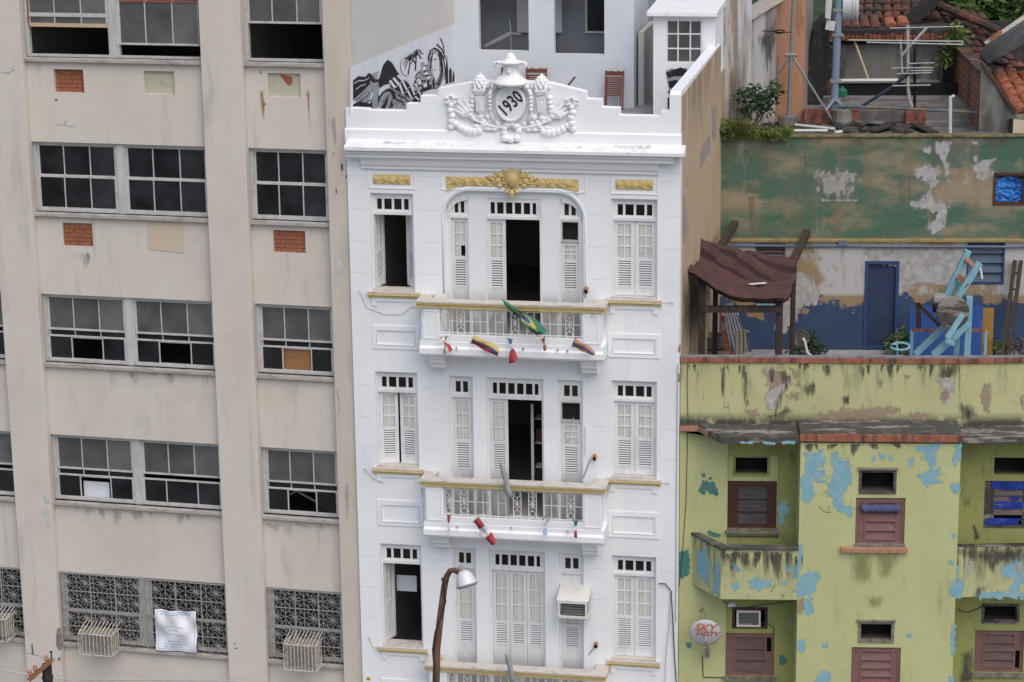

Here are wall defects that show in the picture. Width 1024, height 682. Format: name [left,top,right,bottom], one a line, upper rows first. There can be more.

flaking render [813,168,861,202]
flaking render [972,141,996,181]
flaking render [863,140,967,287]
flaking render [746,366,800,415]
leakage [919,365,955,378]
peeling [698,473,718,497]
peeling [740,441,856,518]
peeling [908,443,963,494]
peeling [679,530,821,618]
peeling [949,555,1024,601]